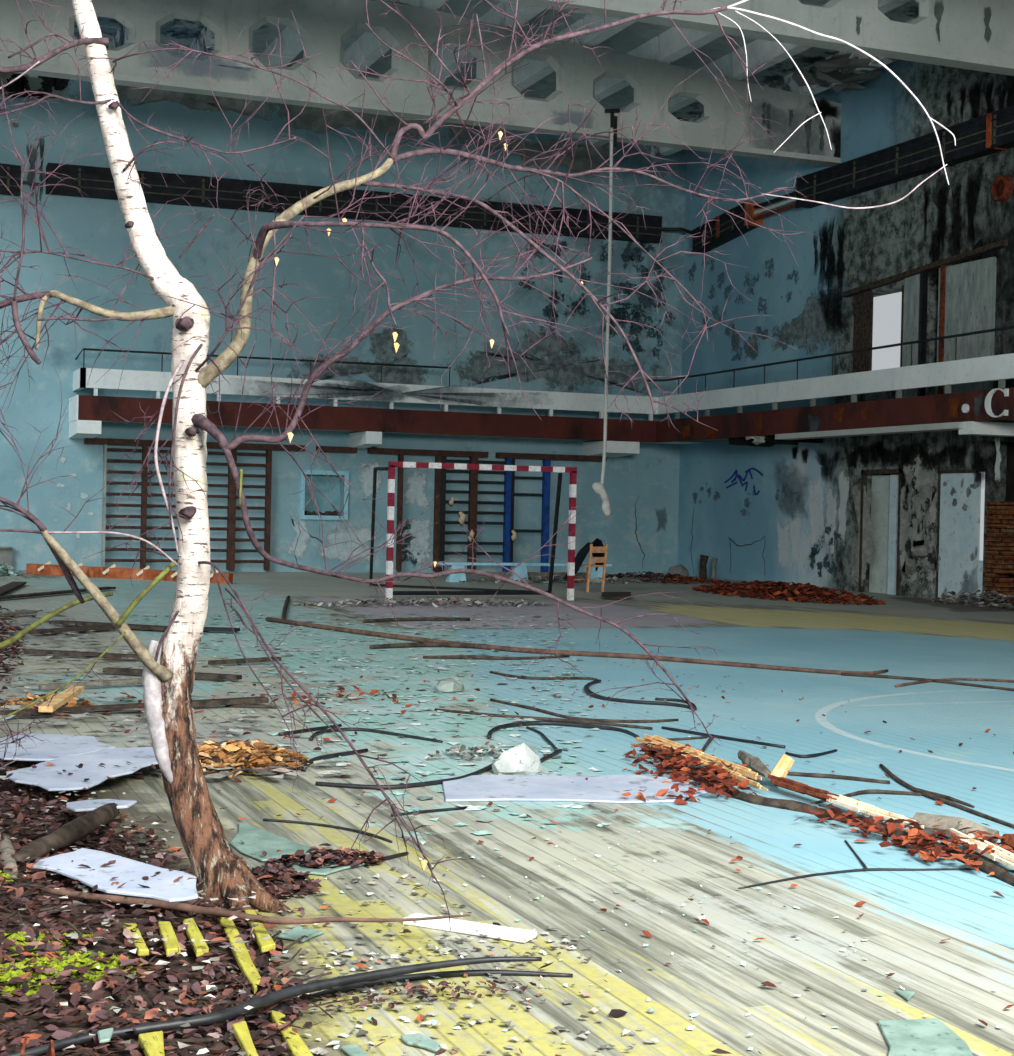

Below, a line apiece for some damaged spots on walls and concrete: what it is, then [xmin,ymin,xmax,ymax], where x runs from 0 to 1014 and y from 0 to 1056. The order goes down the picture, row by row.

spalling [792,53,885,93]
water stain [946,82,1014,119]
water stain [924,169,998,285]
water stain [813,223,845,332]
peeling [287,326,428,385]
peeling [449,329,659,395]
spalling [731,288,838,360]
spalling [850,481,874,586]
water stain [775,441,997,592]